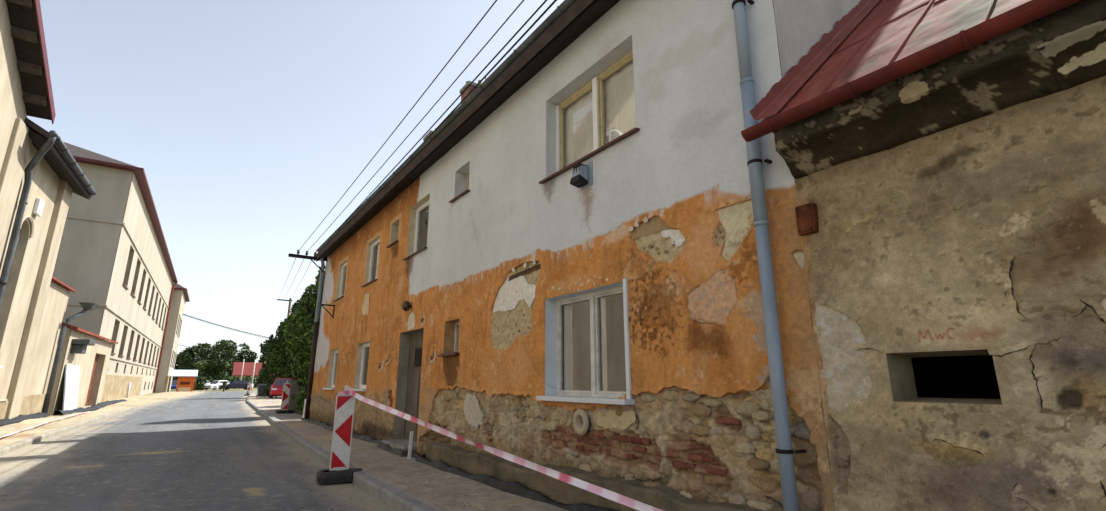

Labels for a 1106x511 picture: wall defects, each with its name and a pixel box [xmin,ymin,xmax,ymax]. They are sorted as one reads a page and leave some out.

peeling [899,80,929,104]
peeling [1037,20,1106,75]
flaking render [490,258,608,350]
flaking render [627,212,689,264]
flaking render [688,196,753,327]
flaking render [814,296,876,412]
crack [987,255,1106,414]
flaking render [419,369,783,511]
flaking render [787,395,825,511]
crack [1098,481,1106,496]